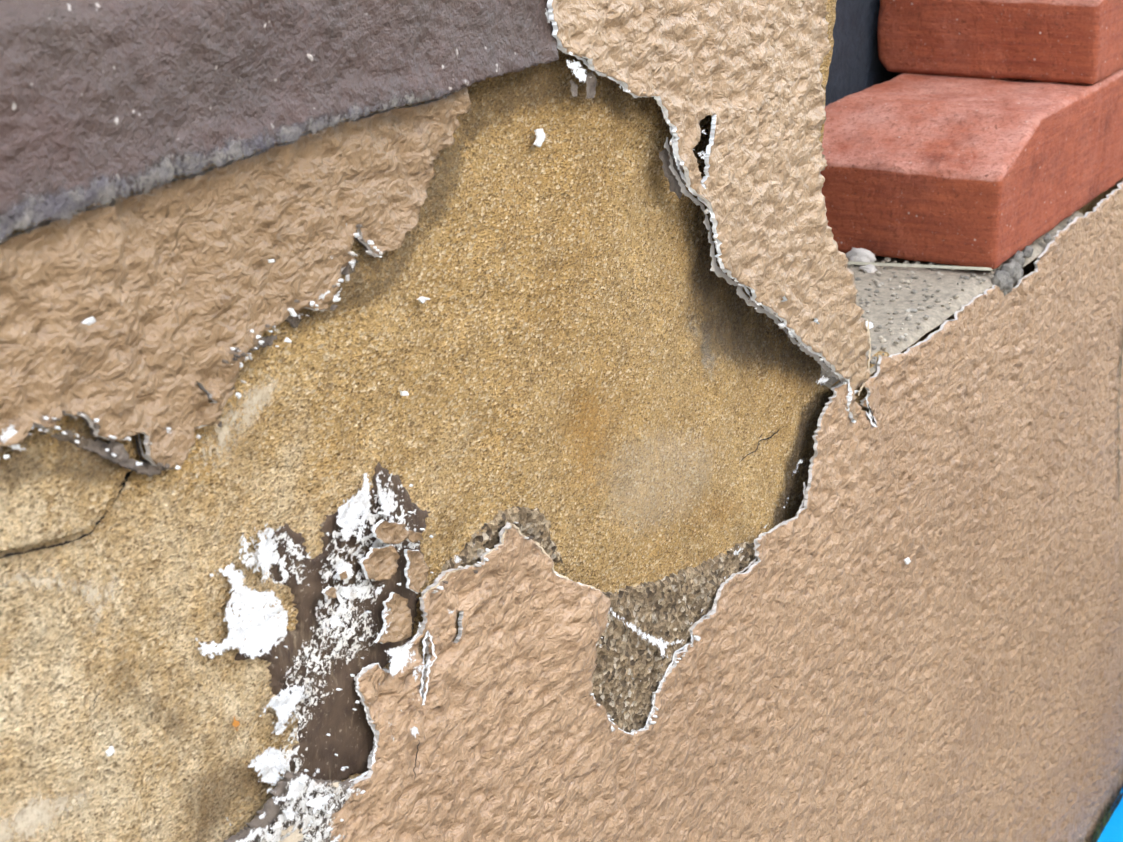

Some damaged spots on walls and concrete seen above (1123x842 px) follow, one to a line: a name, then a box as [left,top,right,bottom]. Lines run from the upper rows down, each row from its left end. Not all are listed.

crack [0,470,133,570]
peeling [0,410,181,477]
peeling [195,0,871,842]
crack [1115,340,1123,504]